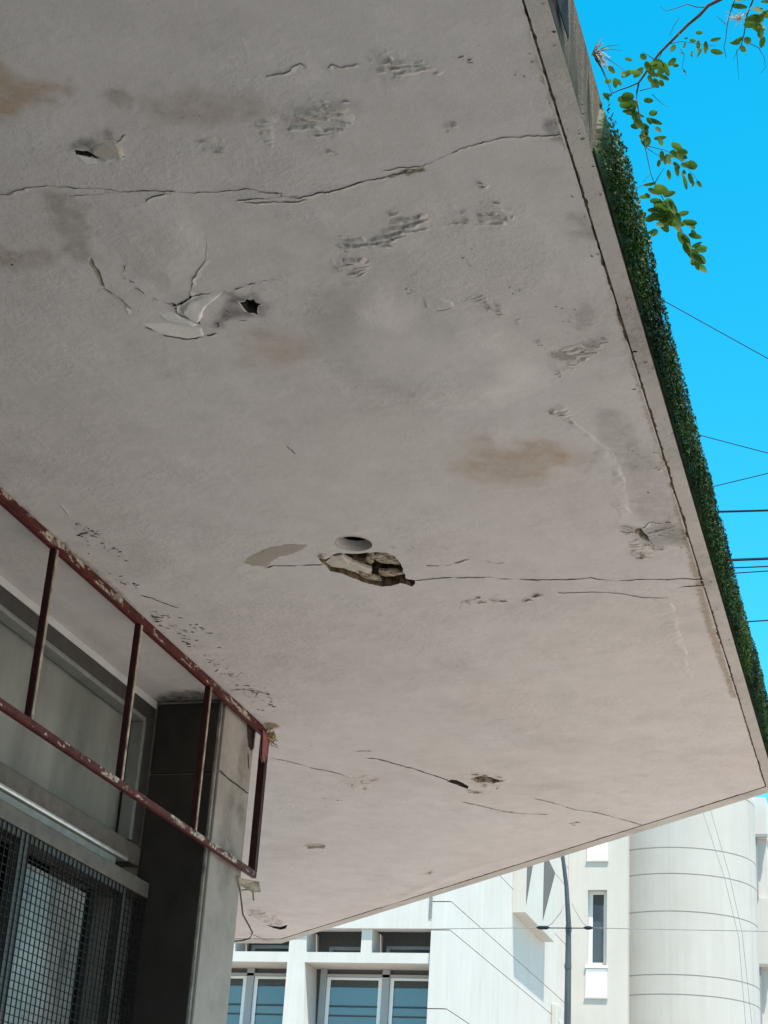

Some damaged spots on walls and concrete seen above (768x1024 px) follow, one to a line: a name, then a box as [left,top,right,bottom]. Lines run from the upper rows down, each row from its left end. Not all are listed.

crack [0,135,562,206]
crack [104,237,277,341]
peeling [625,457,687,560]
peeling [246,545,306,567]
spalling [317,552,415,587]
crack [415,560,705,599]
peeling [0,488,279,752]
crack [221,754,345,794]
crack [357,751,447,781]
peeling [447,772,512,794]